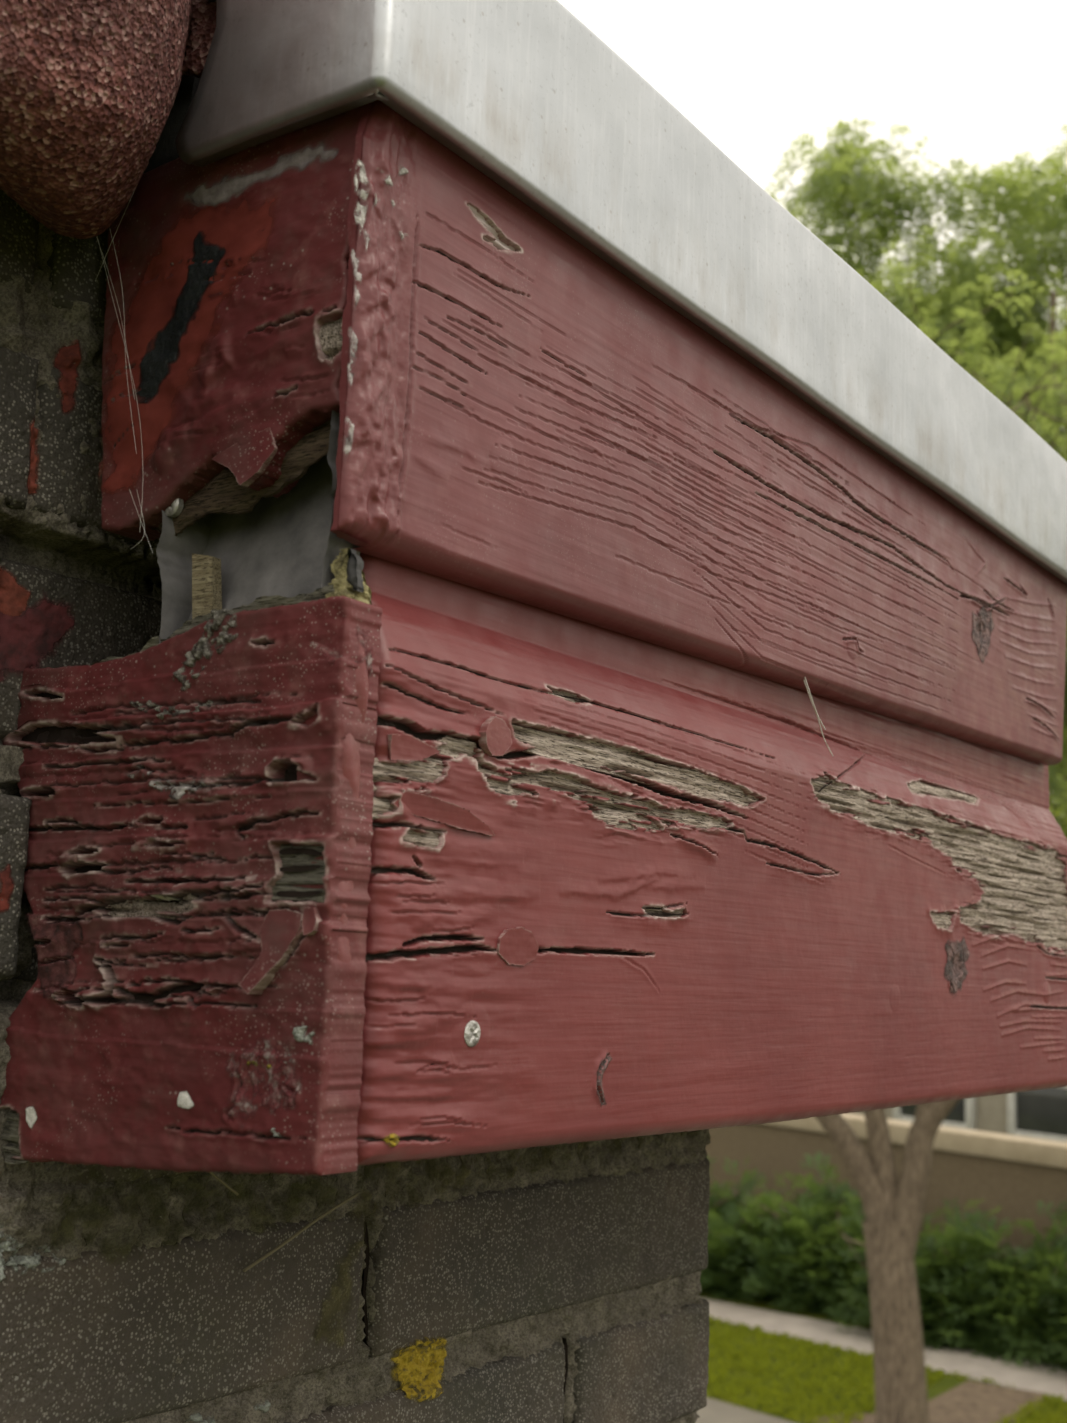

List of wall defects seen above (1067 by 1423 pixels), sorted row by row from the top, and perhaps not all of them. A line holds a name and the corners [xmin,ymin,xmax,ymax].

peeling [318,317,358,384]
peeling [212,427,278,487]
crack [377,650,774,759]
peeling [128,765,206,800]
peeling [372,716,759,848]
crack [591,770,828,875]
peeling [811,761,1067,955]
peeling [239,844,325,994]
crack [365,935,487,961]
crack [538,947,647,955]
crack [606,907,683,917]
crack [361,1220,370,1346]